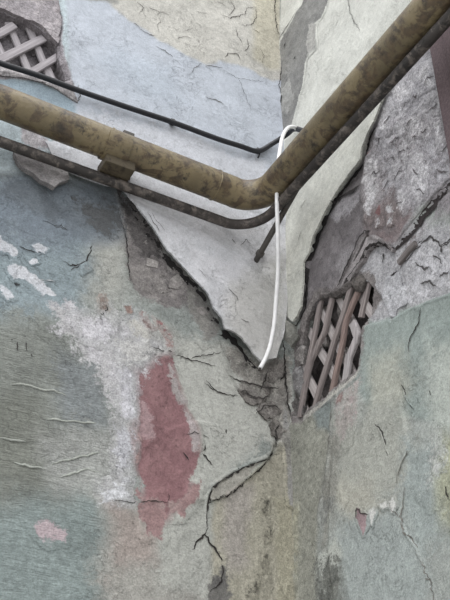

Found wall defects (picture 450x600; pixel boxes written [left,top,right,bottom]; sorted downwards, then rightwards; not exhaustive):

flaking render [0,0,78,103]
crack [192,2,264,72]
peeling [217,49,450,458]
crack [337,175,450,286]
peeling [0,188,227,552]
crack [280,341,291,415]
crack [191,425,279,592]
peeling [354,494,399,539]